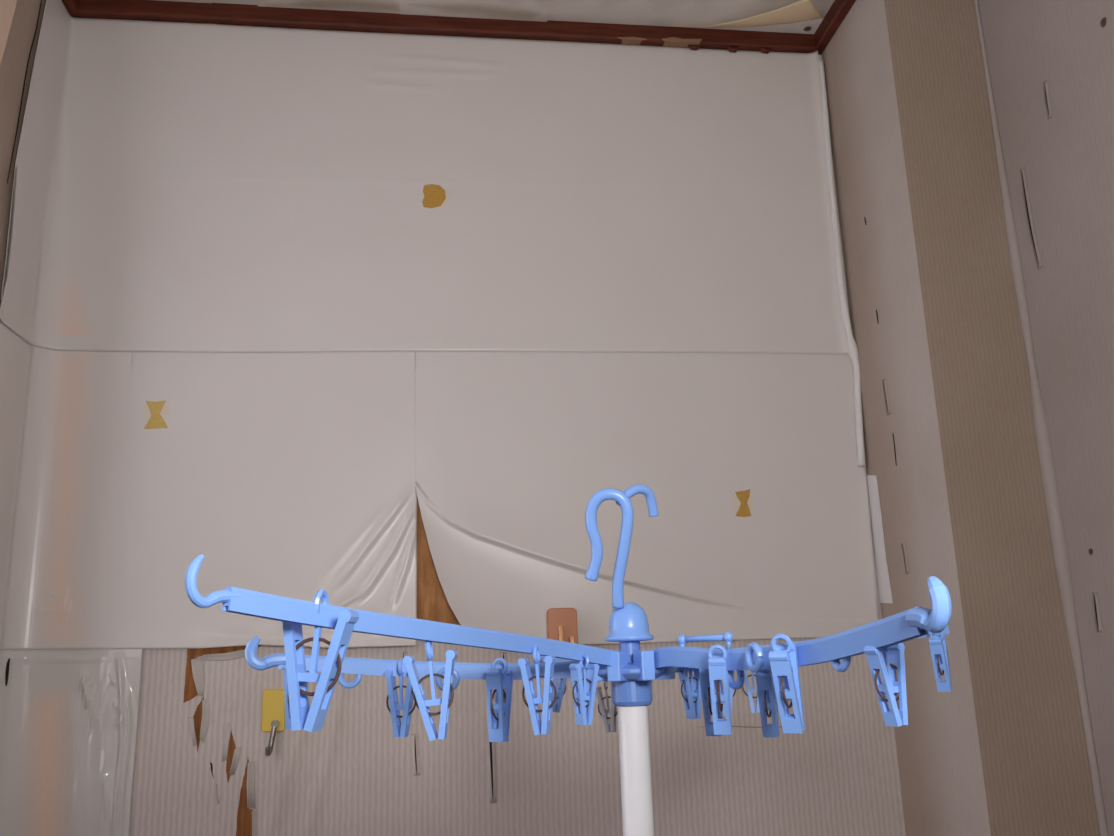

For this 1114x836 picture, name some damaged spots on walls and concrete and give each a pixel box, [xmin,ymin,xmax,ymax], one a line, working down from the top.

peeling [417,498,460,625]
peeling [188,649,245,746]
peeling [222,723,258,836]